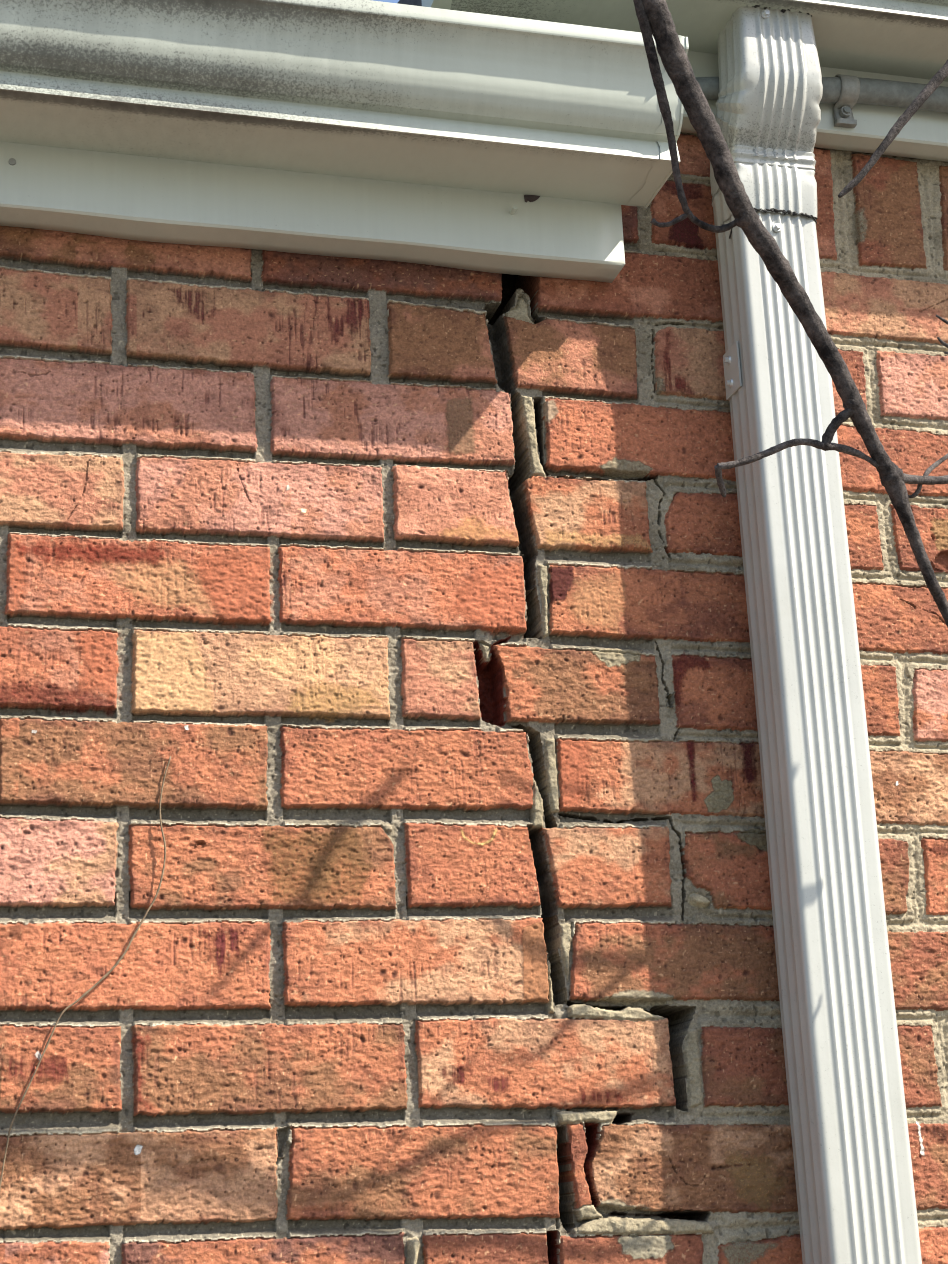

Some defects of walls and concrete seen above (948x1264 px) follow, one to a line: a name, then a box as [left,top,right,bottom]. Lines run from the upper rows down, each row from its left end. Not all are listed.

crack [473,274,706,1112]
crack [546,1109,751,1264]